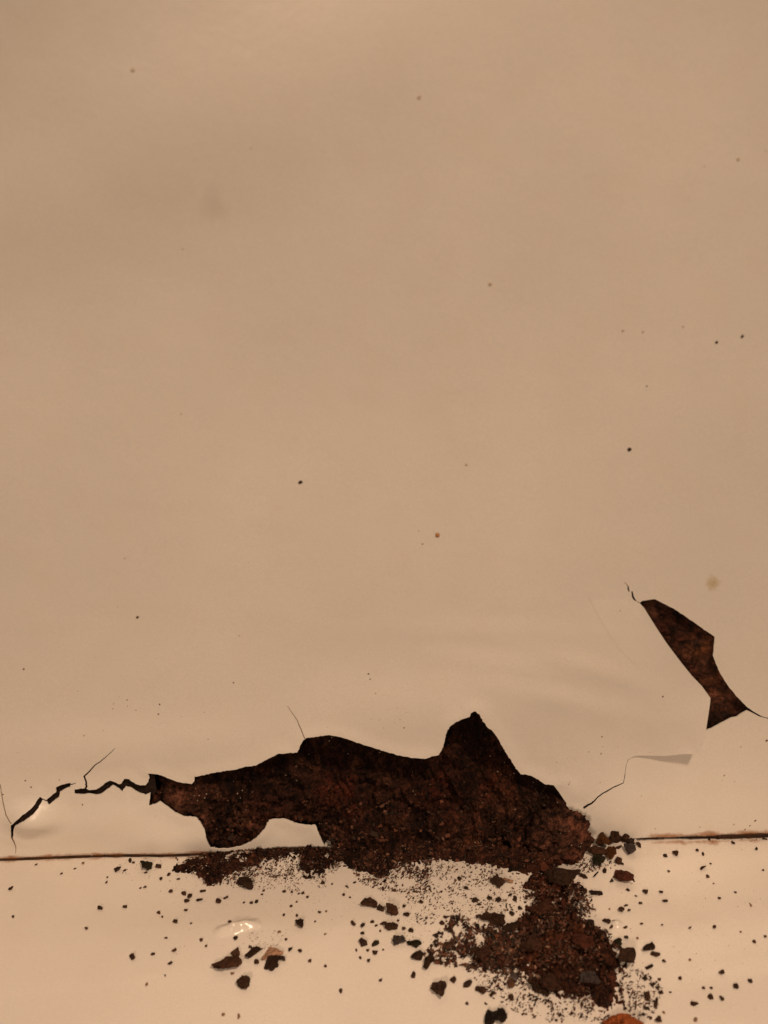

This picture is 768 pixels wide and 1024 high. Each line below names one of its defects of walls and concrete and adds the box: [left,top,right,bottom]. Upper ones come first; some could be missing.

crack [0,748,157,854]
peeling [149,598,767,871]
crack [583,761,628,809]